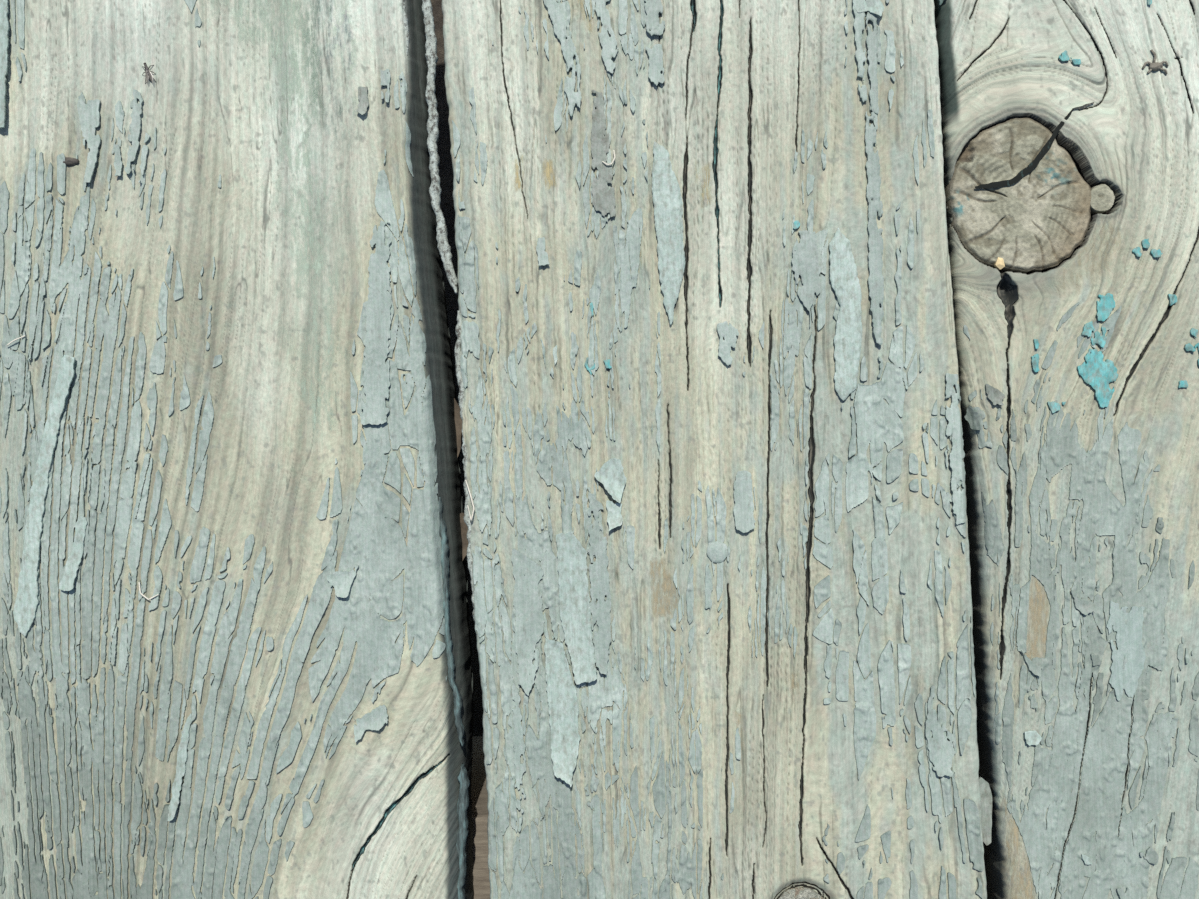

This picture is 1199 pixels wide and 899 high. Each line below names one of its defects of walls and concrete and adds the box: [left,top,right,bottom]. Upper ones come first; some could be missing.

peeling [0,0,27,128]
peeling [185,0,202,47]
peeling [394,71,414,177]
crack [975,0,1117,189]
crack [1157,14,1194,114]
crack [1114,227,1199,416]
crack [683,0,773,845]
peeling [452,0,1199,899]
crack [997,247,1077,680]
crack [752,307,853,899]
crack [346,759,445,899]
crack [708,586,730,899]